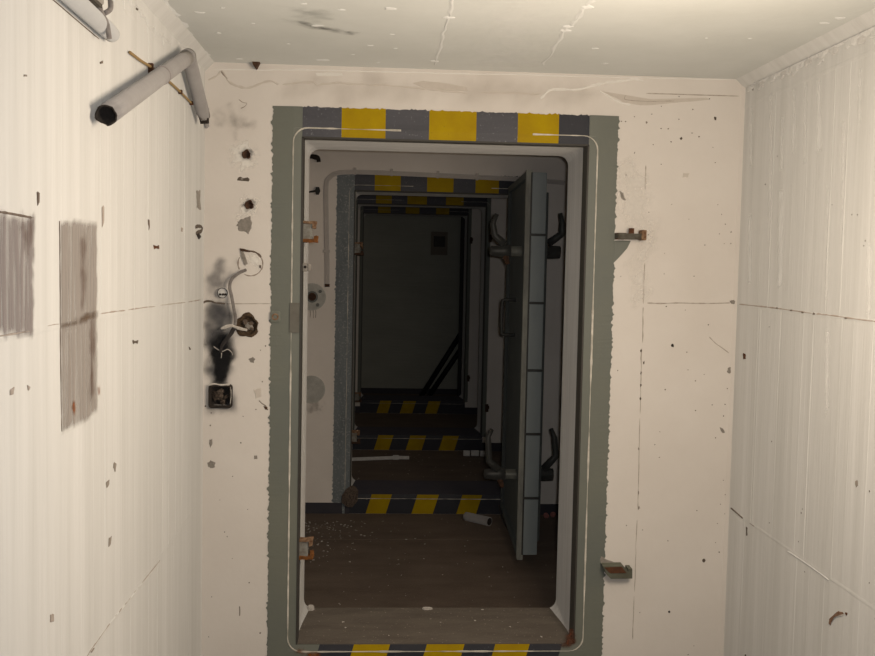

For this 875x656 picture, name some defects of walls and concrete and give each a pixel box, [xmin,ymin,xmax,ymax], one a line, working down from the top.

spalling [231,142,251,181]
spalling [236,200,255,234]